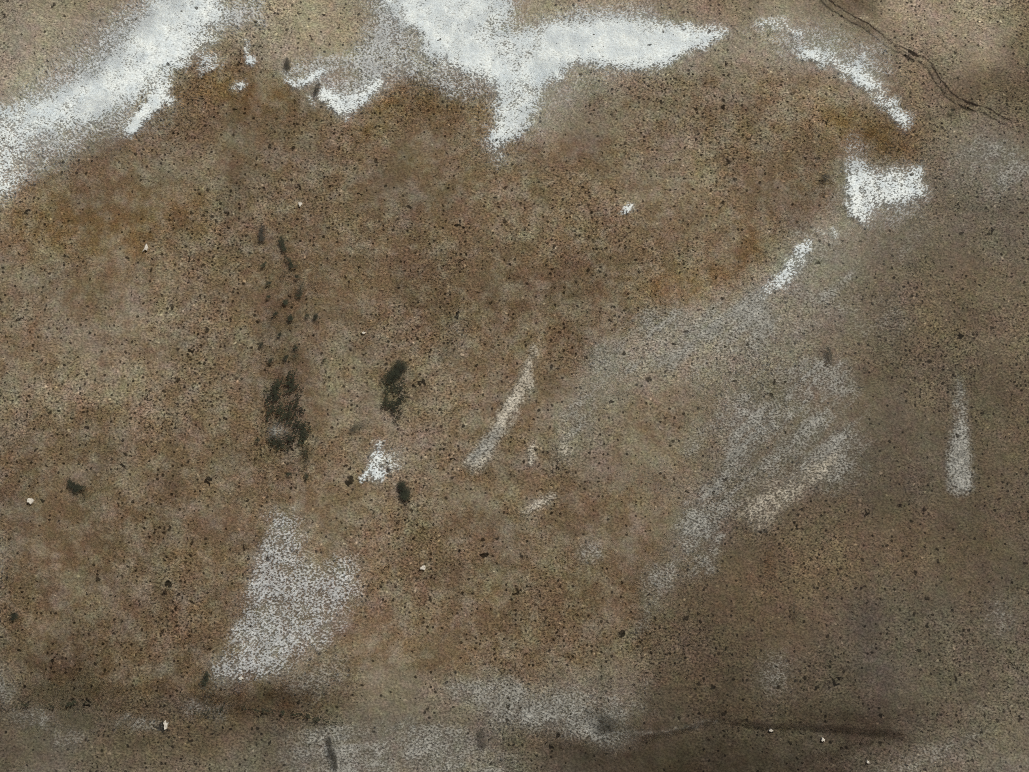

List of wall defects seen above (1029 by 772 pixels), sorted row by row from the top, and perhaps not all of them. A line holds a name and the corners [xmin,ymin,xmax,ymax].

damp [283,0,728,158]
damp [756,18,913,127]
crack [828,0,1024,128]
damp [845,156,927,222]
damp [266,236,318,321]
damp [626,239,812,372]
damp [255,344,317,478]
damp [359,442,398,483]
damp [380,359,409,421]
damp [397,481,412,505]
damp [683,347,853,545]
damp [200,519,355,686]